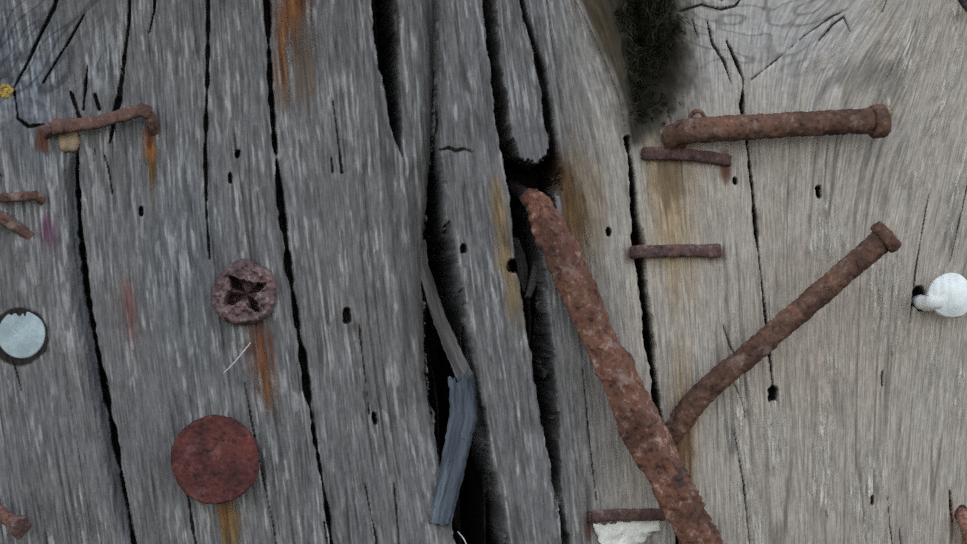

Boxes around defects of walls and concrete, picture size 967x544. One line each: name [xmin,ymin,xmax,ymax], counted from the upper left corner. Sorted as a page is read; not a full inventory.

corrosion [275,0,306,93]
crack [371,0,380,70]
crack [681,0,777,114]
crack [803,12,848,38]
corrosion [555,156,588,242]
crack [623,137,661,416]
crack [745,140,767,324]
crack [76,154,136,544]
corrosion [247,325,275,376]
crack [421,264,462,464]
corrosion [218,500,239,544]
crack [452,449,496,544]